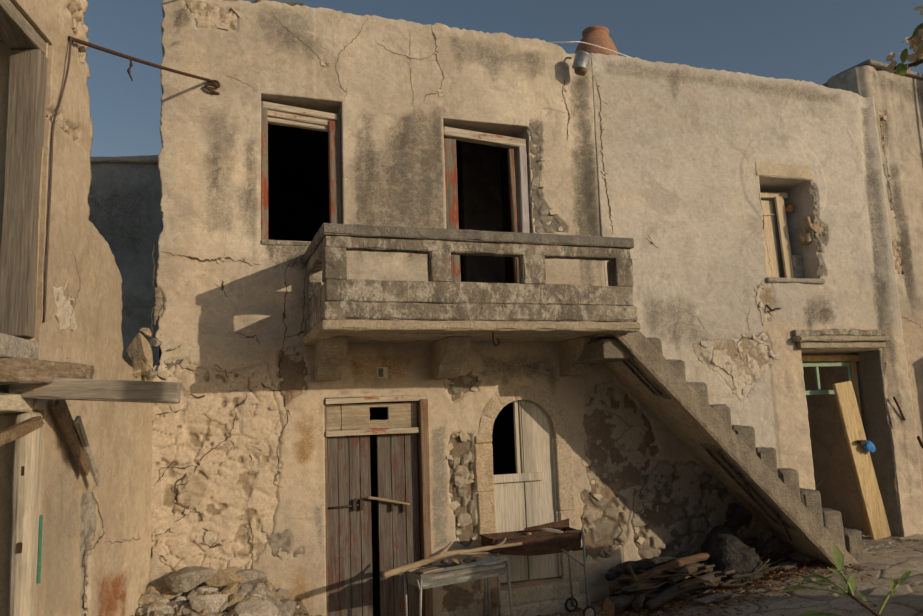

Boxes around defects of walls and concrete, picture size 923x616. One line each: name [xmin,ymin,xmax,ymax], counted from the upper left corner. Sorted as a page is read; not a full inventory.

crack [271,11,368,101]
damp [359,117,442,228]
crack [379,25,444,114]
crack [542,80,570,139]
crack [594,76,613,233]
crack [82,245,306,616]
flaking render [151,344,314,572]
flaking render [447,431,476,547]
flaking render [447,369,484,401]
flaking render [580,379,796,564]
flaking render [692,283,777,402]
corrosion [100,576,126,616]